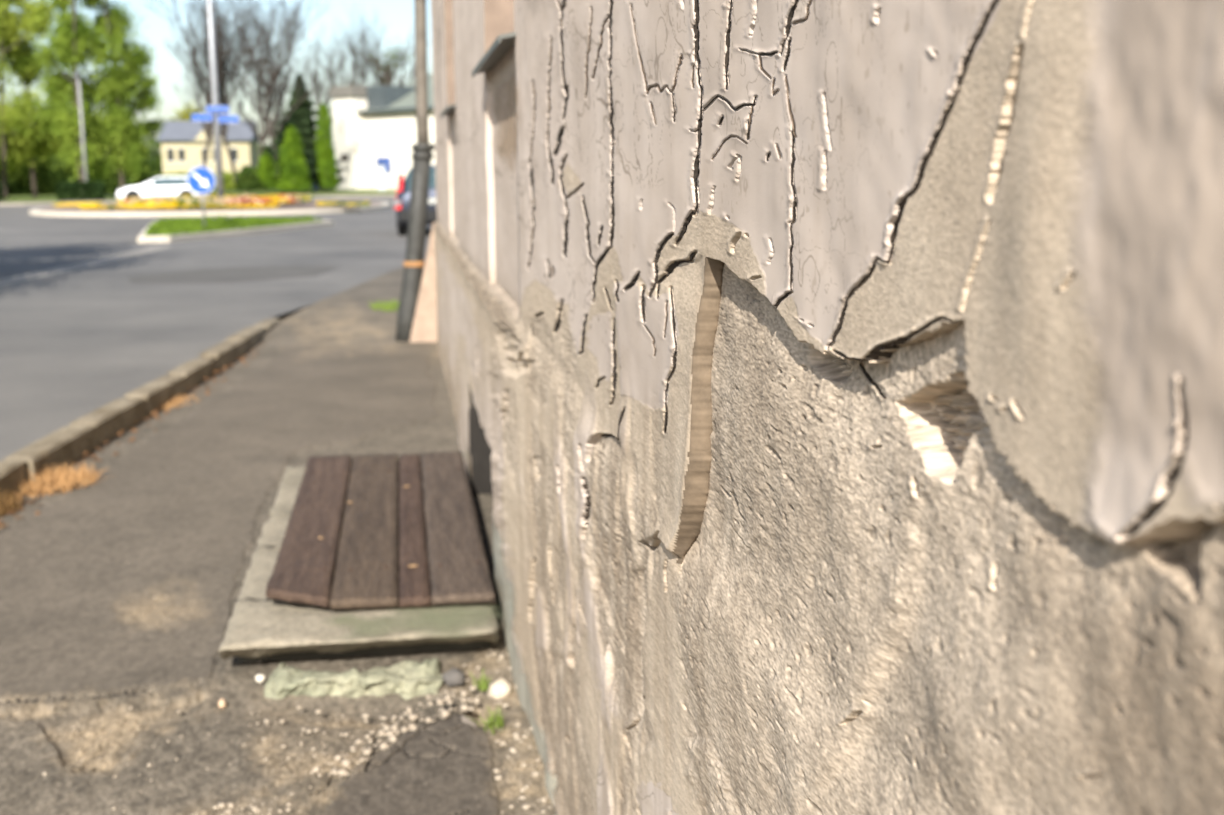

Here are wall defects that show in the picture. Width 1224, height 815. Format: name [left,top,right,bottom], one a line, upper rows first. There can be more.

crack [581,477,591,525]
crack [528,0,812,442]
flaking render [582,0,1224,815]
crack [826,0,999,398]
crack [1120,378,1189,540]
crack [352,718,487,769]